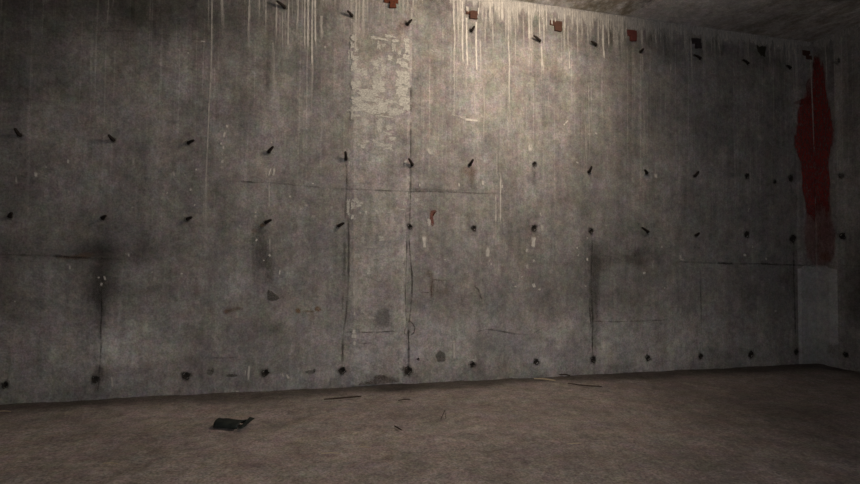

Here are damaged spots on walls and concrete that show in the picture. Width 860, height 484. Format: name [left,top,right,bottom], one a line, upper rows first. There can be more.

leakage [248,0,323,74]
leakage [450,0,860,219]